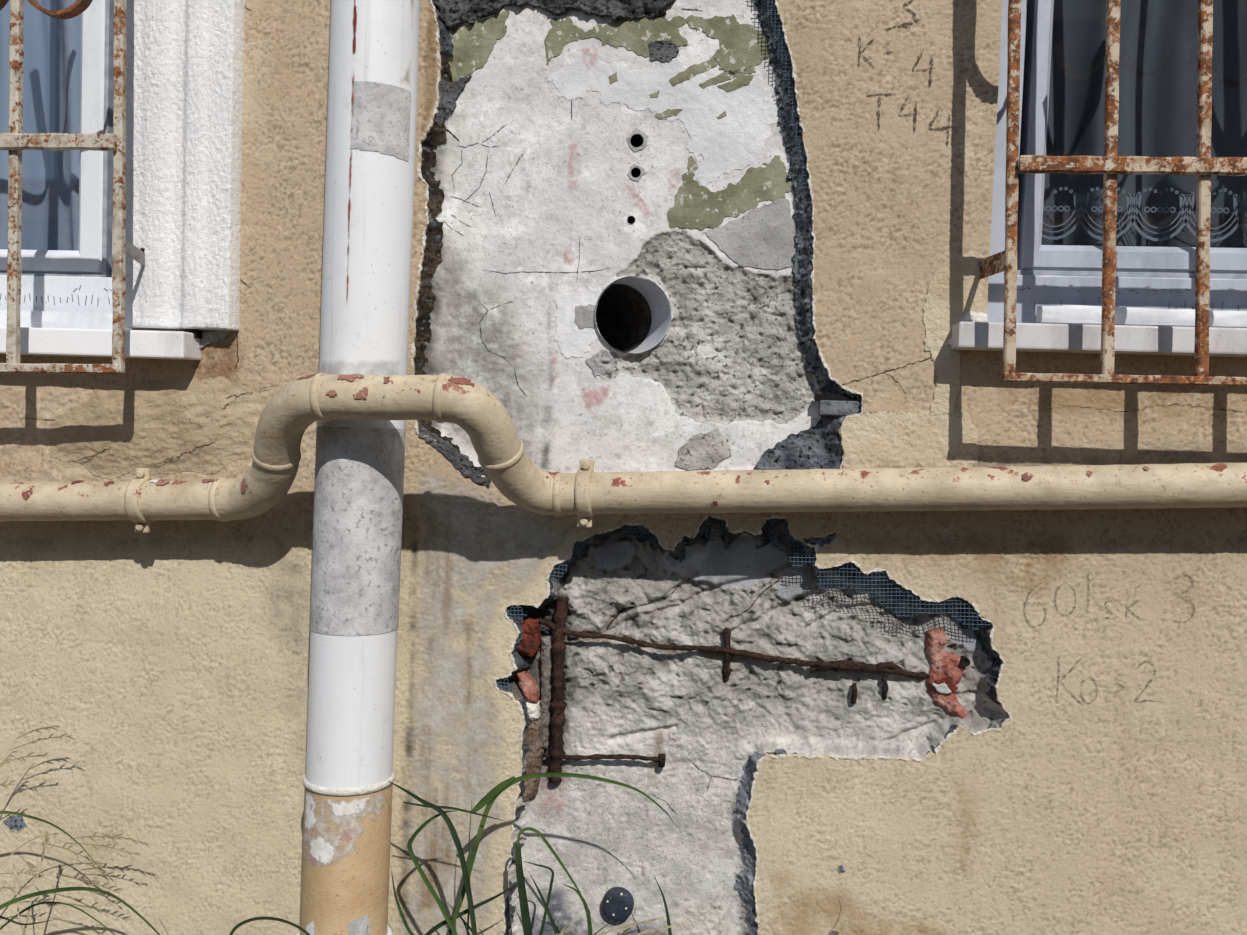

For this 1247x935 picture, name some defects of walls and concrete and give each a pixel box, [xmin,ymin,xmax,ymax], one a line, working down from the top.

peeling [297,373,368,399]
crack [444,123,523,236]
flaking render [411,0,863,483]
spalling [493,501,1012,935]